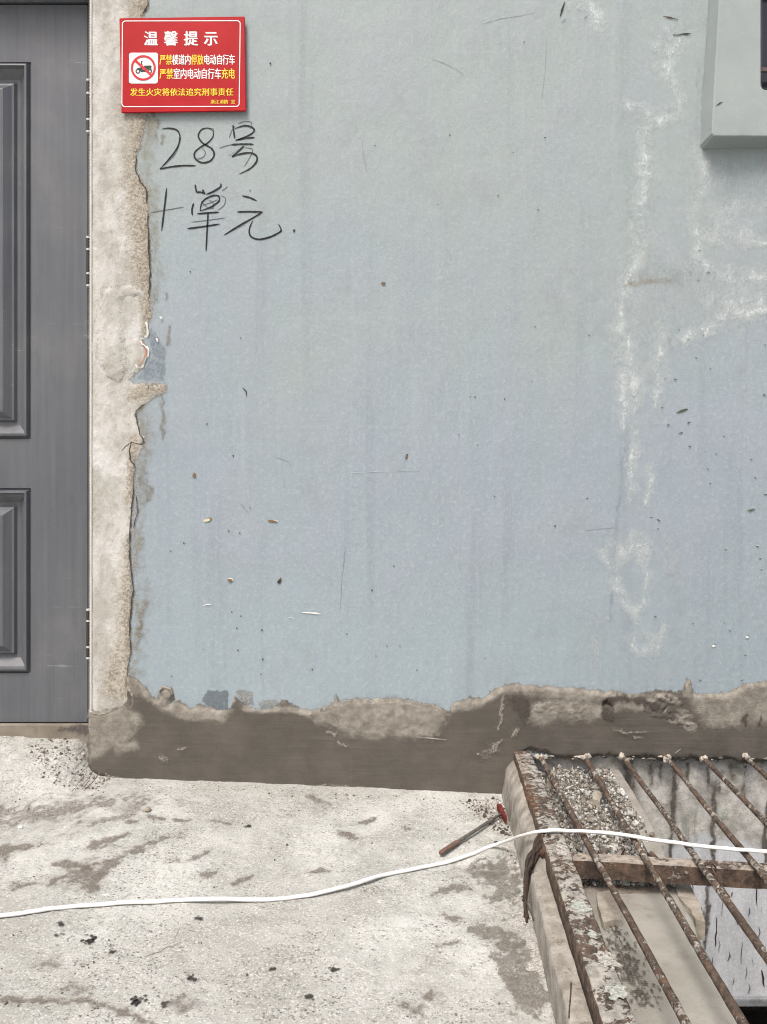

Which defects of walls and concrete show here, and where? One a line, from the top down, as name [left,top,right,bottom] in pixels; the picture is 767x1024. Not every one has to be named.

peeling [90,0,167,714]
damp [615,236,668,491]
damp [626,31,681,226]
damp [679,159,767,343]
crack [122,392,149,673]